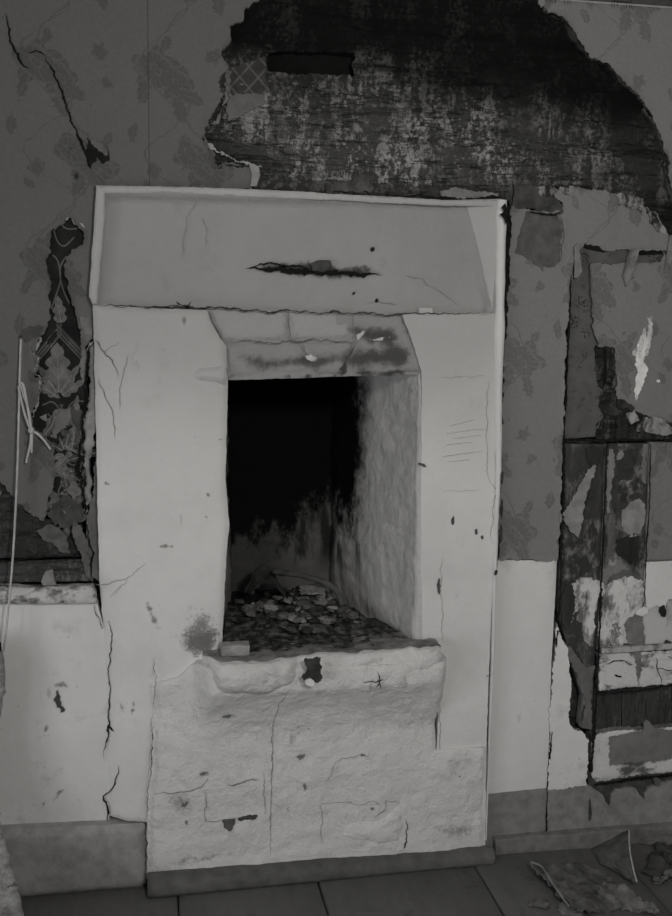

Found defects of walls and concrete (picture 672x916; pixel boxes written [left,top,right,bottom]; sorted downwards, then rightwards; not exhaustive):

crack [6,15,91,169]
spalling [200,0,672,271]
crack [96,276,491,366]
crack [247,262,379,278]
spalling [72,315,99,582]
crack [75,341,144,820]
spalling [302,657,322,686]